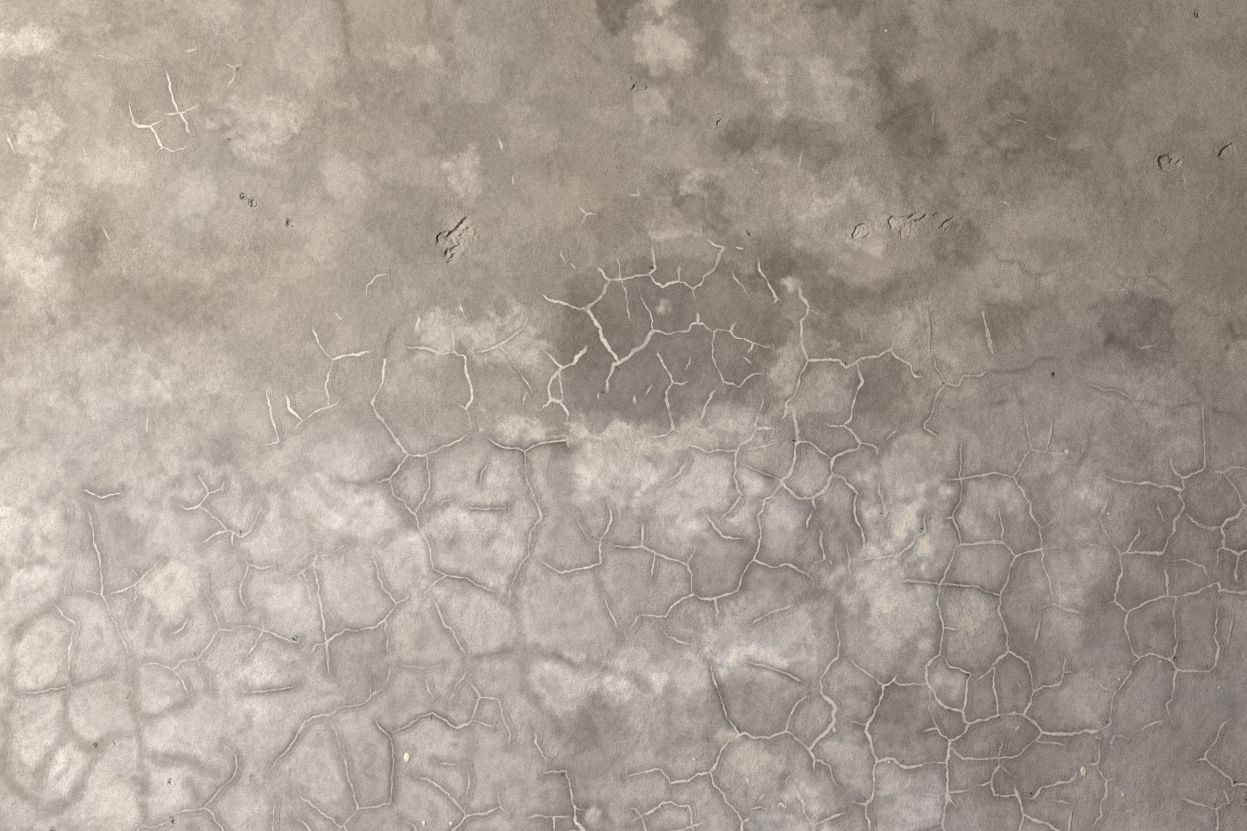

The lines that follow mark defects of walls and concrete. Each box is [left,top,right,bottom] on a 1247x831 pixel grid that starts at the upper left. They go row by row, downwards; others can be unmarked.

crack [123,43,245,158]
spalling [428,199,492,272]
crack [0,293,54,325]
crack [17,201,1247,831]